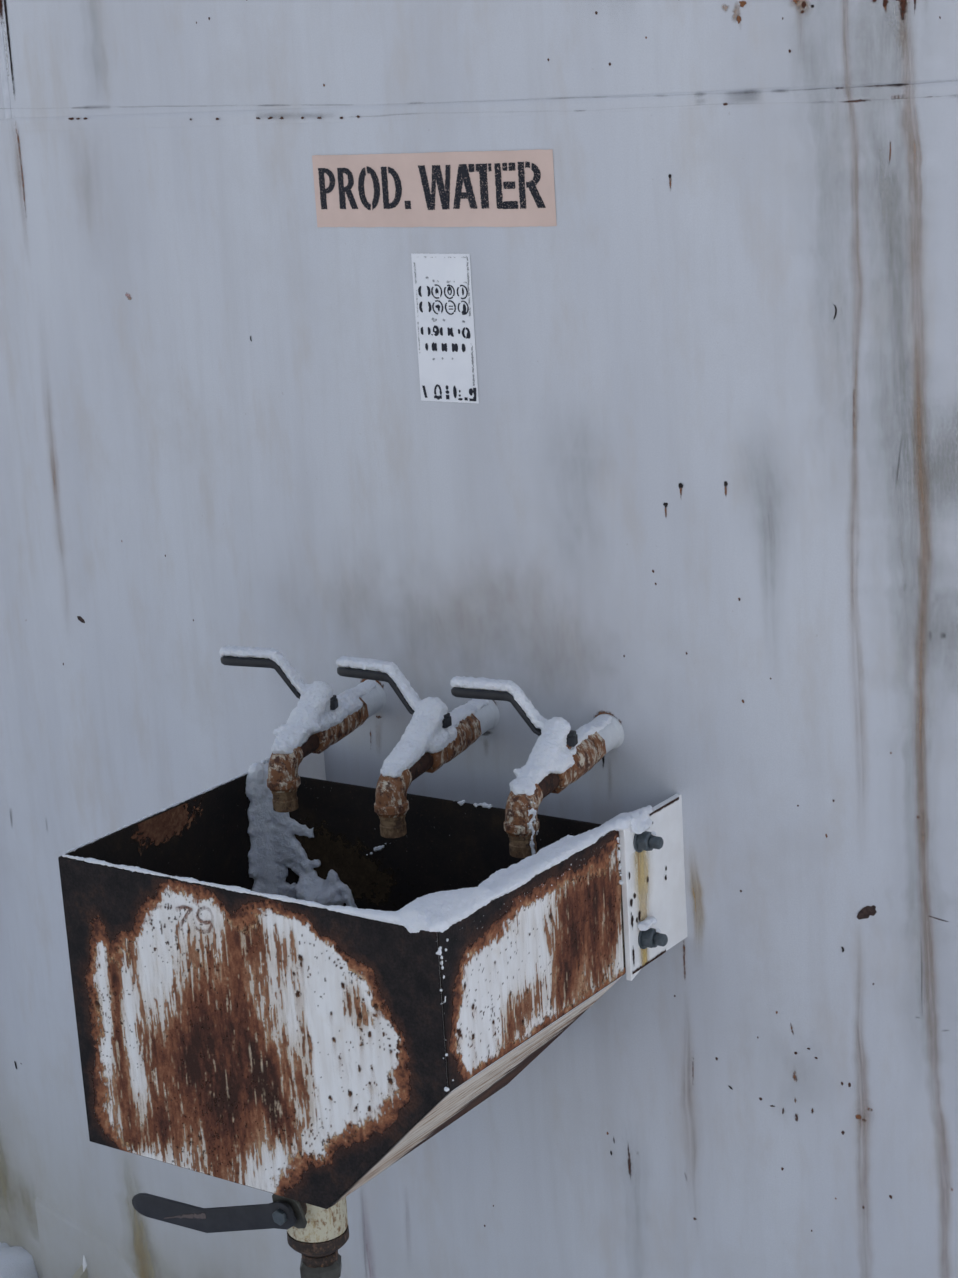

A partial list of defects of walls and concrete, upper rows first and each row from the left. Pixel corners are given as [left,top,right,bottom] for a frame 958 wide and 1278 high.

rust [723,1,746,24]
rust [793,0,814,13]
rust [873,0,916,20]
rust [0,0,15,93]